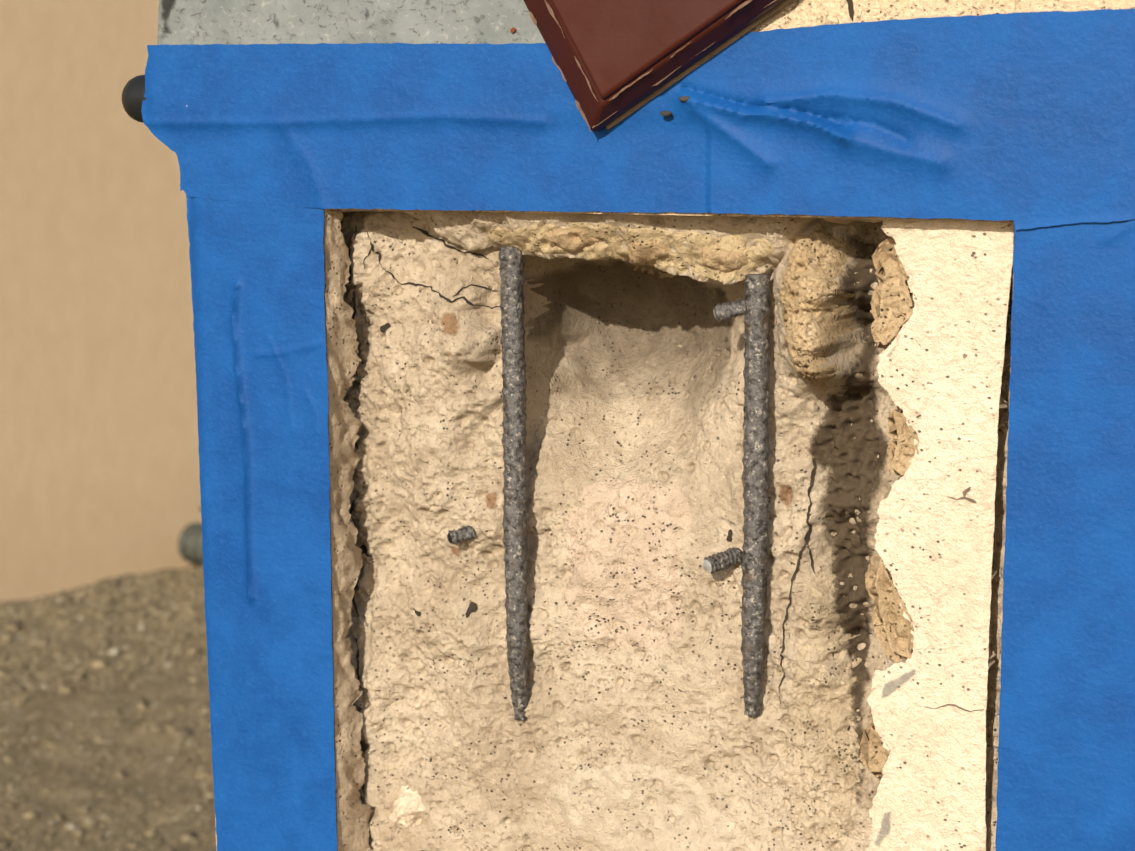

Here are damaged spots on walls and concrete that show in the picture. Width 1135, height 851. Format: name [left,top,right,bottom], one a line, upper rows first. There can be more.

crack [346,226,499,321]
spalling [870,237,915,349]
spalling [487,221,775,721]
water stain [809,390,857,468]
spalling [886,406,919,476]
crack [779,436,817,704]
water stain [838,587,860,654]
spalling [865,554,914,663]
spalling [860,720,891,777]